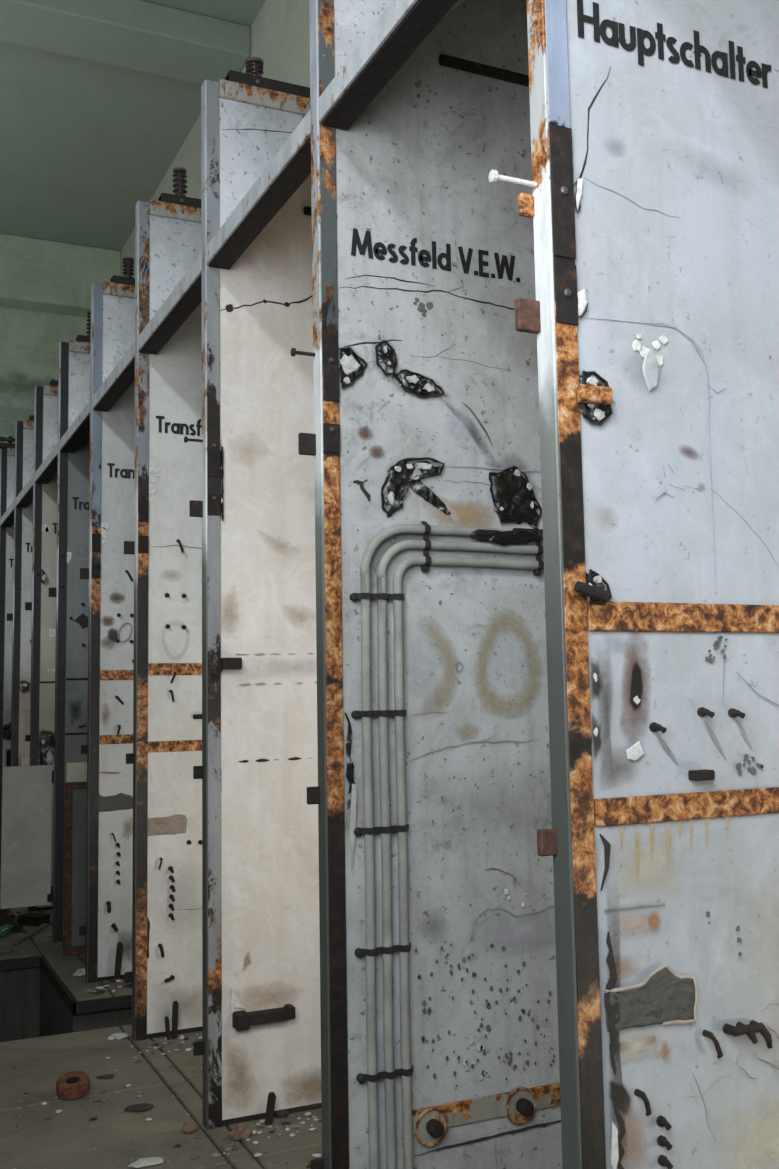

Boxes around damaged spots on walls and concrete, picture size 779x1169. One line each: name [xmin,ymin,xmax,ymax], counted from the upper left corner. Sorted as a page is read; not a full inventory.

crack [574,66,680,218]
crack [222,295,313,310]
crack [341,275,515,310]
spalling [339,340,445,398]
spalling [381,457,451,517]
spalling [489,465,542,527]
rust [415,1108,448,1147]
rust [506,1087,561,1125]